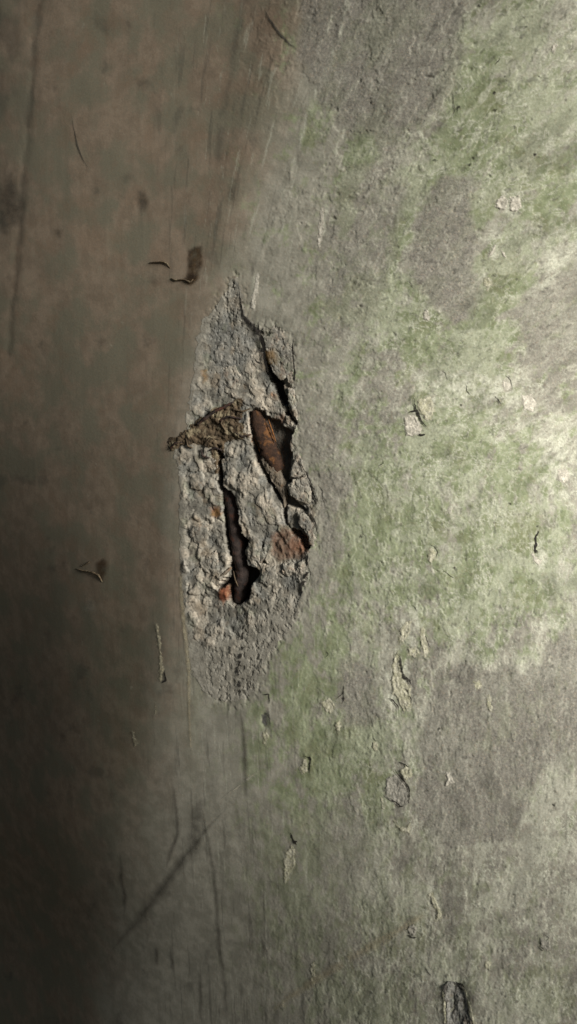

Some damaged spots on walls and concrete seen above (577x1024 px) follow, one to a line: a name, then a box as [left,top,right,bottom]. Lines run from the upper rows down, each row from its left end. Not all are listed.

crack [238,283,296,384]
peeling [404,396,435,437]
spalling [173,273,319,702]
crack [289,456,326,594]
peeling [381,762,412,809]
spalling [441,981,477,1024]